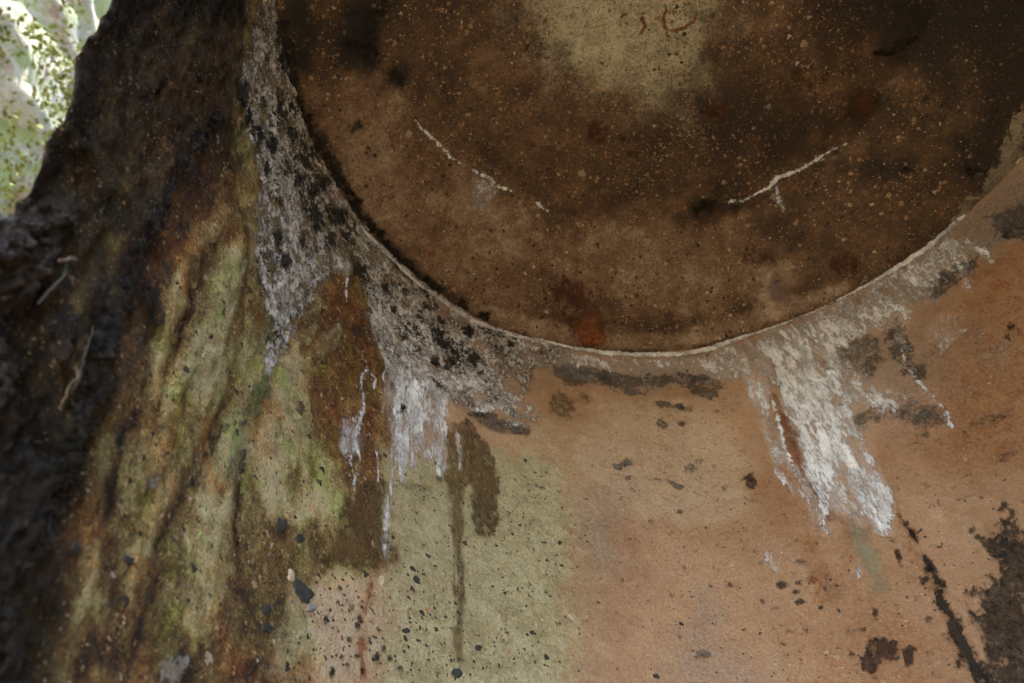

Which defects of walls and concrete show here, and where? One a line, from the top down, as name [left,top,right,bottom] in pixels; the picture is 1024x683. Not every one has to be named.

crack [415,119,512,208]
crack [729,143,847,203]
rust [543,275,607,348]
leakage [238,0,994,660]